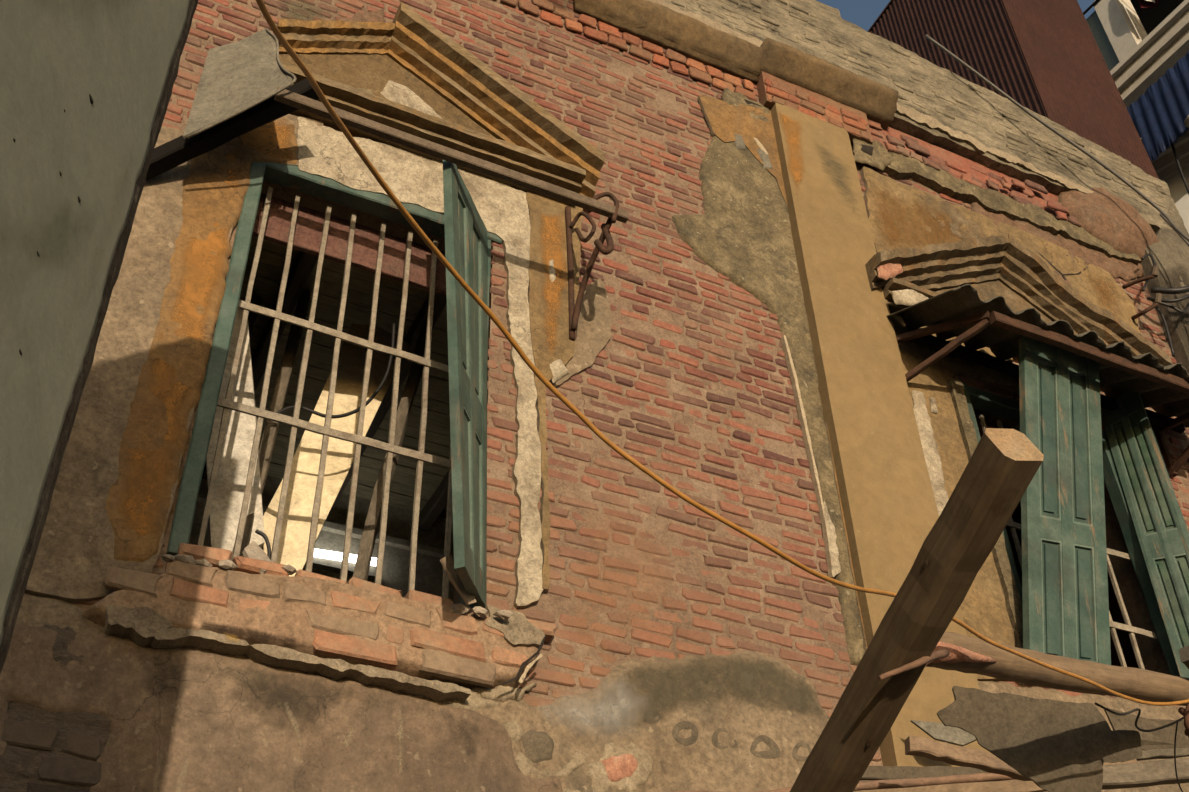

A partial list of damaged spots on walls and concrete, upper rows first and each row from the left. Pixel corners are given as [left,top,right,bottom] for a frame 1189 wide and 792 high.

corrosion [238,122,290,158]
flaking render [734,134,773,169]
flaking render [548,259,556,282]
spalling [877,263,929,306]
flaking render [549,359,569,384]
peeling [781,335,841,578]
flaking render [416,682,537,711]
water stain [570,660,818,728]